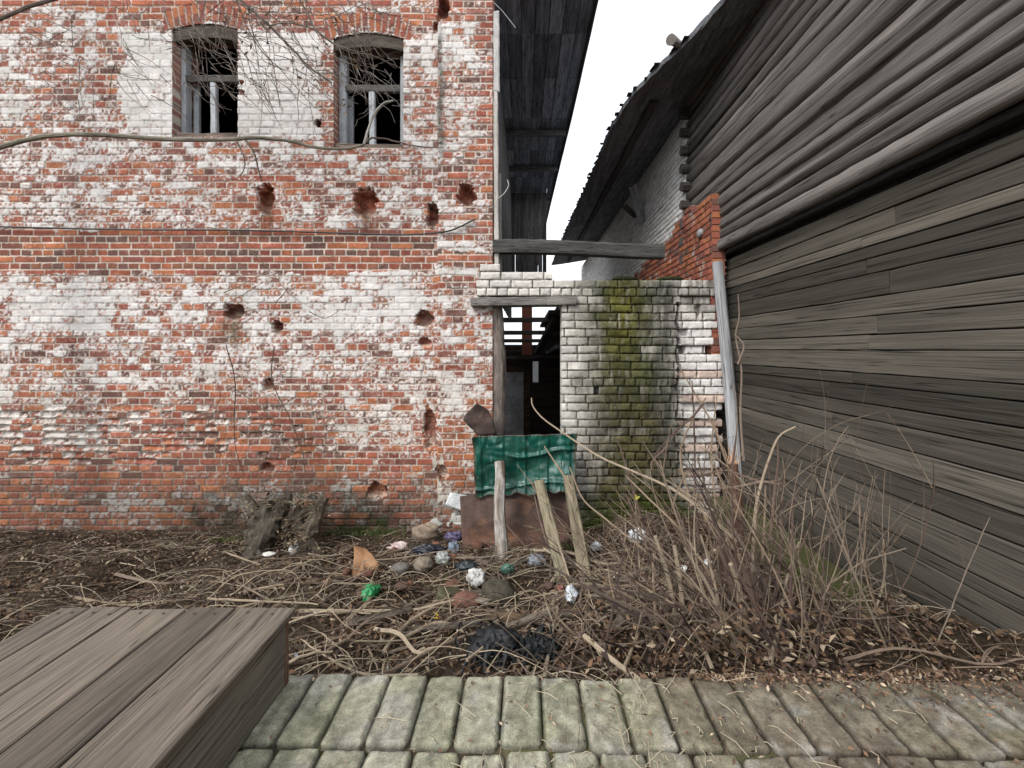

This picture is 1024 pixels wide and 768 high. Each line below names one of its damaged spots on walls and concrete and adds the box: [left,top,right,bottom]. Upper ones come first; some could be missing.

peeling [0,0,493,533]
leakage [591,284,680,517]